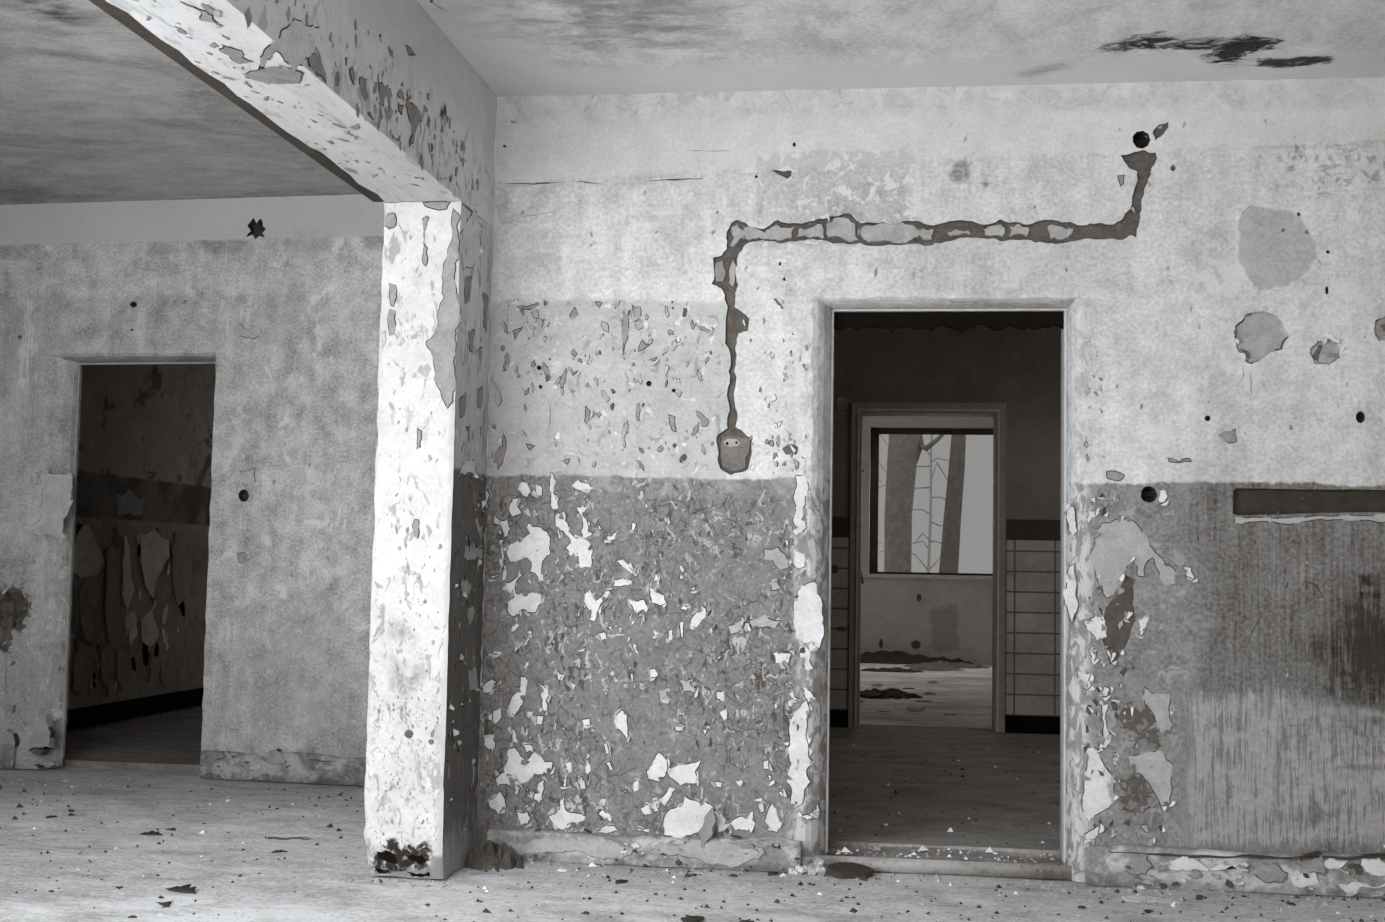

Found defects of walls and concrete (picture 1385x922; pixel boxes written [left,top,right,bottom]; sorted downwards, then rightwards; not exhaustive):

water stain [1100,32,1333,68]
peeling [1084,323,1119,413]
spalling [1233,306,1289,364]
spalling [1310,333,1346,365]
spalling [1364,316,1385,344]
peeling [180,0,846,876]
peeling [0,489,193,696]
peeling [1061,437,1385,897]
spalling [0,699,62,769]
water stain [1181,575,1385,851]